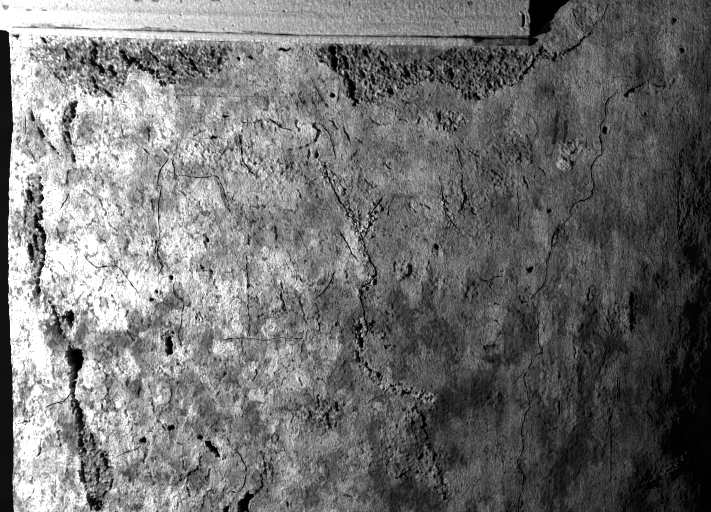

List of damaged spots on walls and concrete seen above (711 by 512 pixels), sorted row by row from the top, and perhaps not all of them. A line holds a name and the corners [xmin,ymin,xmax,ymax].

crack [566,4,608,53]
flaking render [11,33,255,166]
flaking render [313,43,568,112]
crack [513,53,640,512]
flaking render [20,170,117,512]
crack [366,389,388,405]
crack [400,424,421,480]